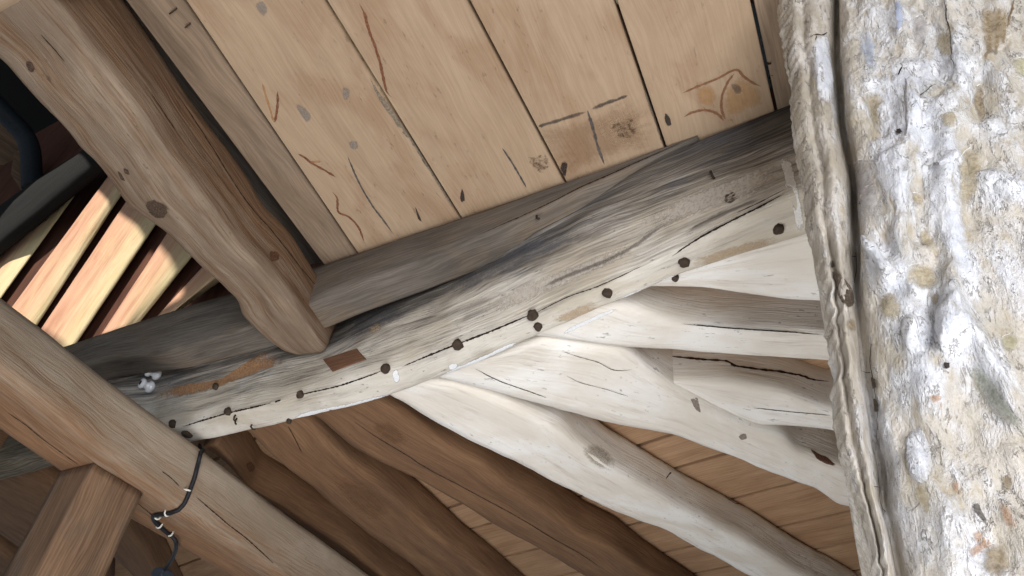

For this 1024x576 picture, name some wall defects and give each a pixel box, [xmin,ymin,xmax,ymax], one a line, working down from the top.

crack [405,267,639,366]
crack [687,324,820,335]
crack [565,352,627,396]
crack [672,356,823,381]
crack [183,371,381,427]